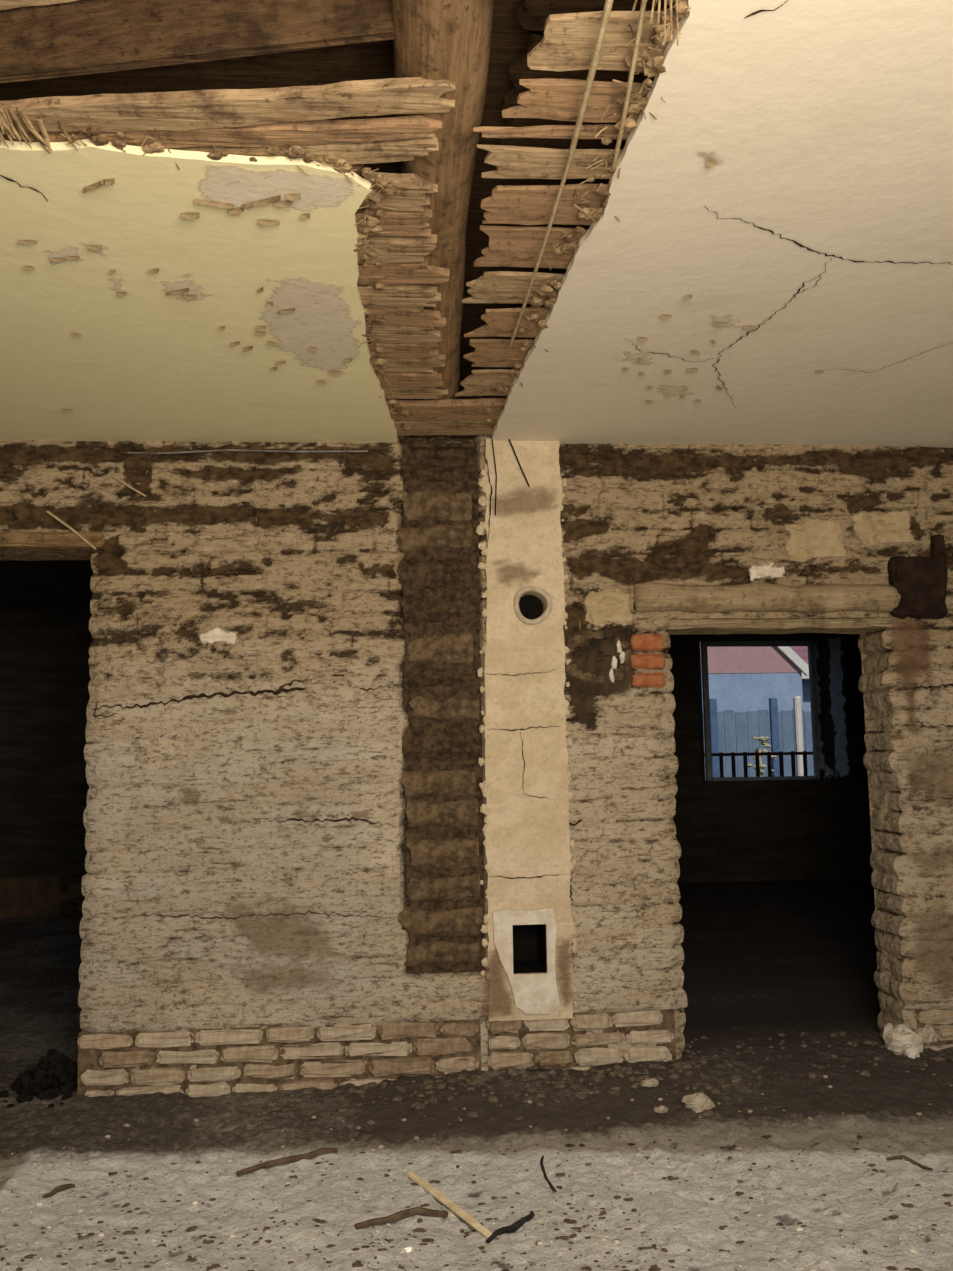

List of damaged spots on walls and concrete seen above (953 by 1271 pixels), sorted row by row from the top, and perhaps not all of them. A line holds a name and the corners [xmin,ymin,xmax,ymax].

crack [745,0,788,18]
crack [0,175,48,201]
peeling [83,179,114,194]
peeling [181,165,361,226]
peeling [18,240,108,265]
peeling [148,268,211,301]
peeling [230,277,362,384]
crack [629,207,953,408]
spalling [559,446,953,684]
crack [92,678,317,718]
spalling [0,442,486,974]
peeling [813,637,850,779]